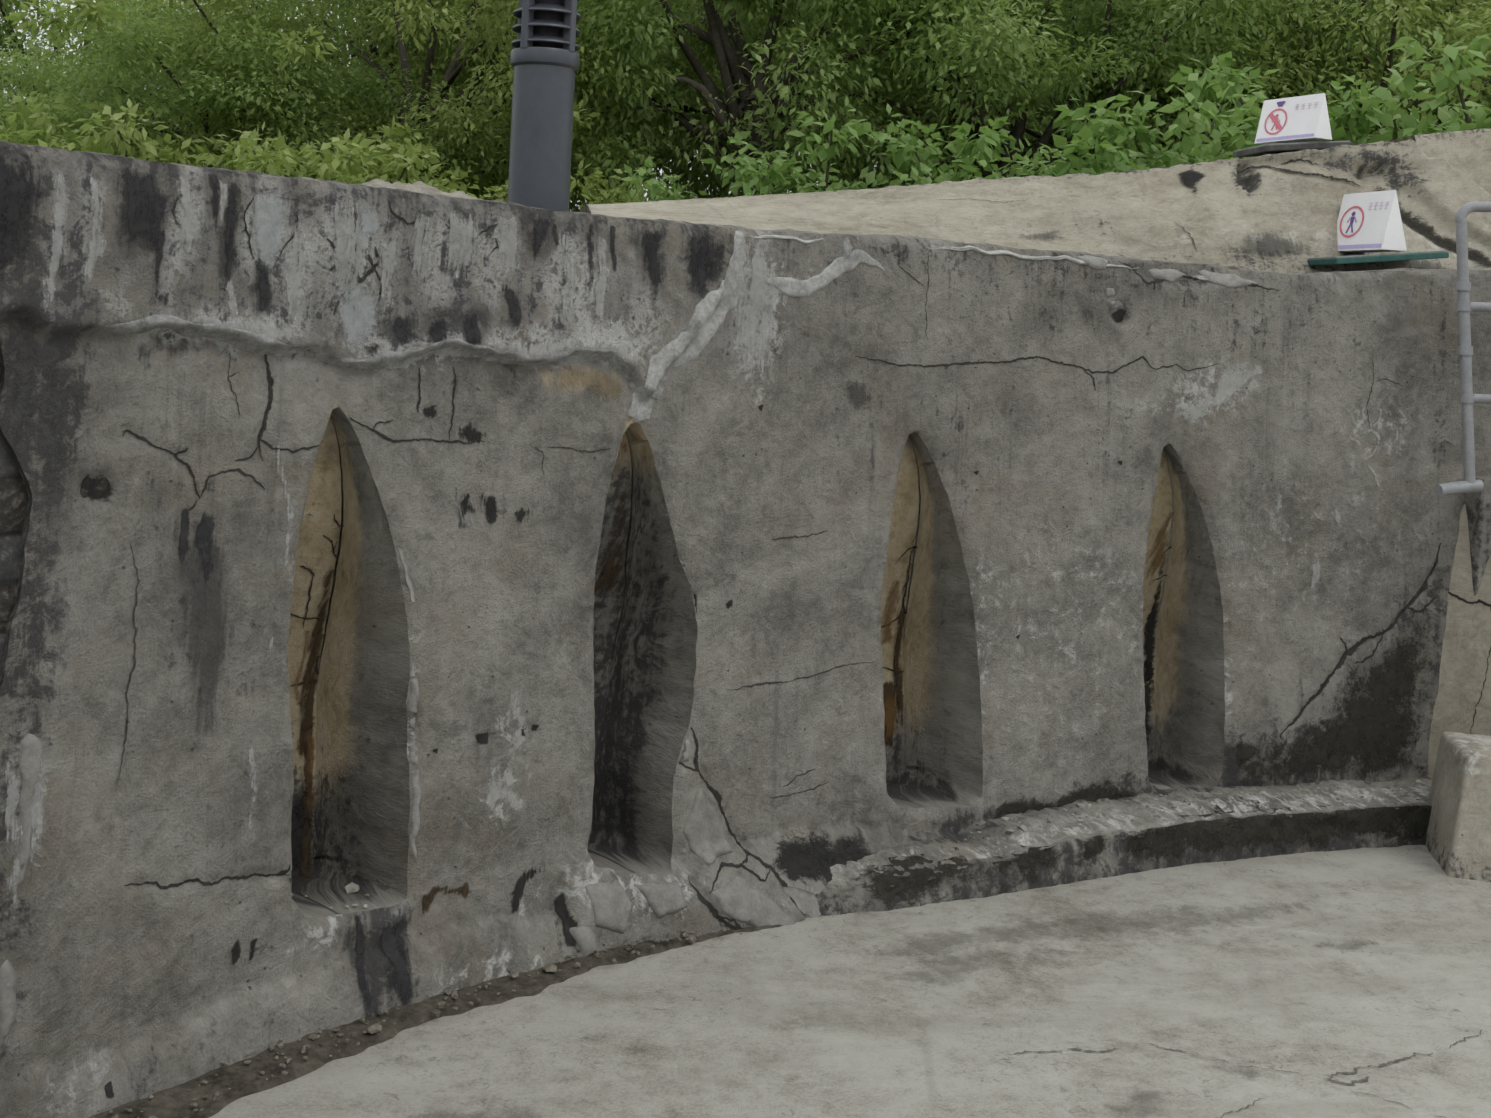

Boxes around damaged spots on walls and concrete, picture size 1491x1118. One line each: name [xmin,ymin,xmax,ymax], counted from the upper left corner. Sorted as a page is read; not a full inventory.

leakage [0,155,67,305]
leakage [117,167,306,341]
leakage [334,199,628,360]
crack [858,256,1216,390]
crack [123,352,320,511]
corrosion [295,536,339,878]
spalling [476,732,488,744]
corrosion [882,536,916,747]
crack [1280,543,1491,738]
crack [124,865,291,890]
crack [679,727,805,930]
mould [775,830,872,884]